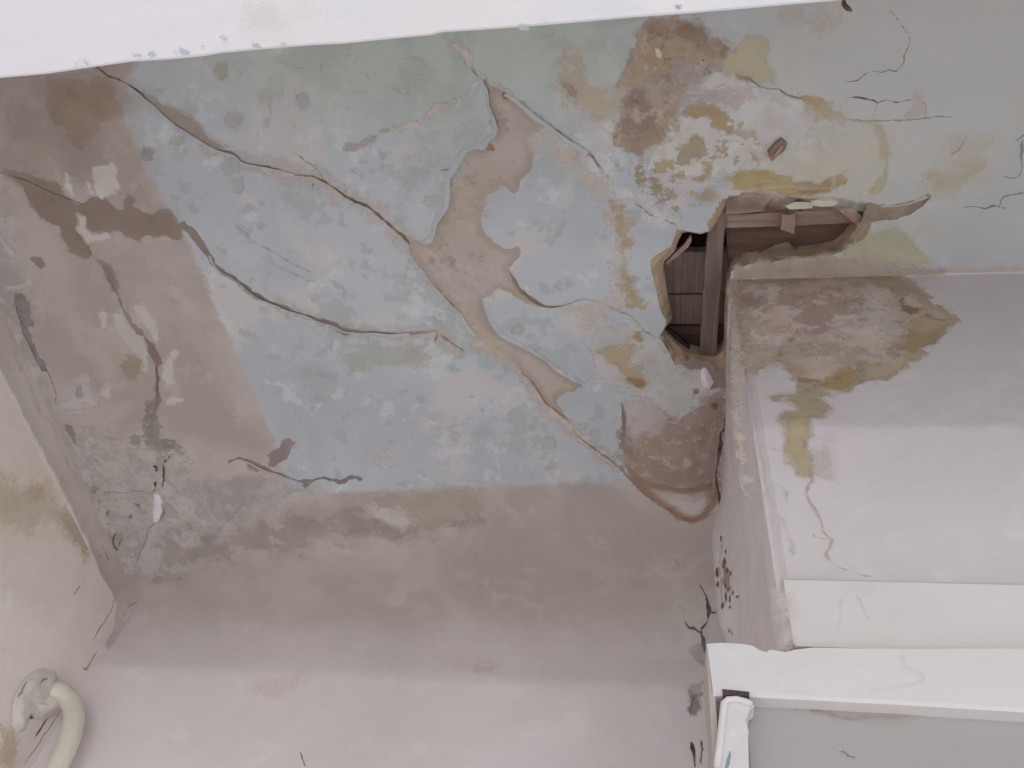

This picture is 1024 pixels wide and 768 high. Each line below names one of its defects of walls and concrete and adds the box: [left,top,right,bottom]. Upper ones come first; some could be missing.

damp [2,77,182,292]
crack [96,67,412,256]
damp [617,124,888,218]
peeling [786,199,840,209]
spalling [850,194,931,243]
crack [179,221,463,350]
peeling [409,79,730,496]
crack [98,276,184,583]
crack [228,458,363,489]
damp [728,230,959,520]
crack [679,585,732,653]
mould [715,536,739,609]